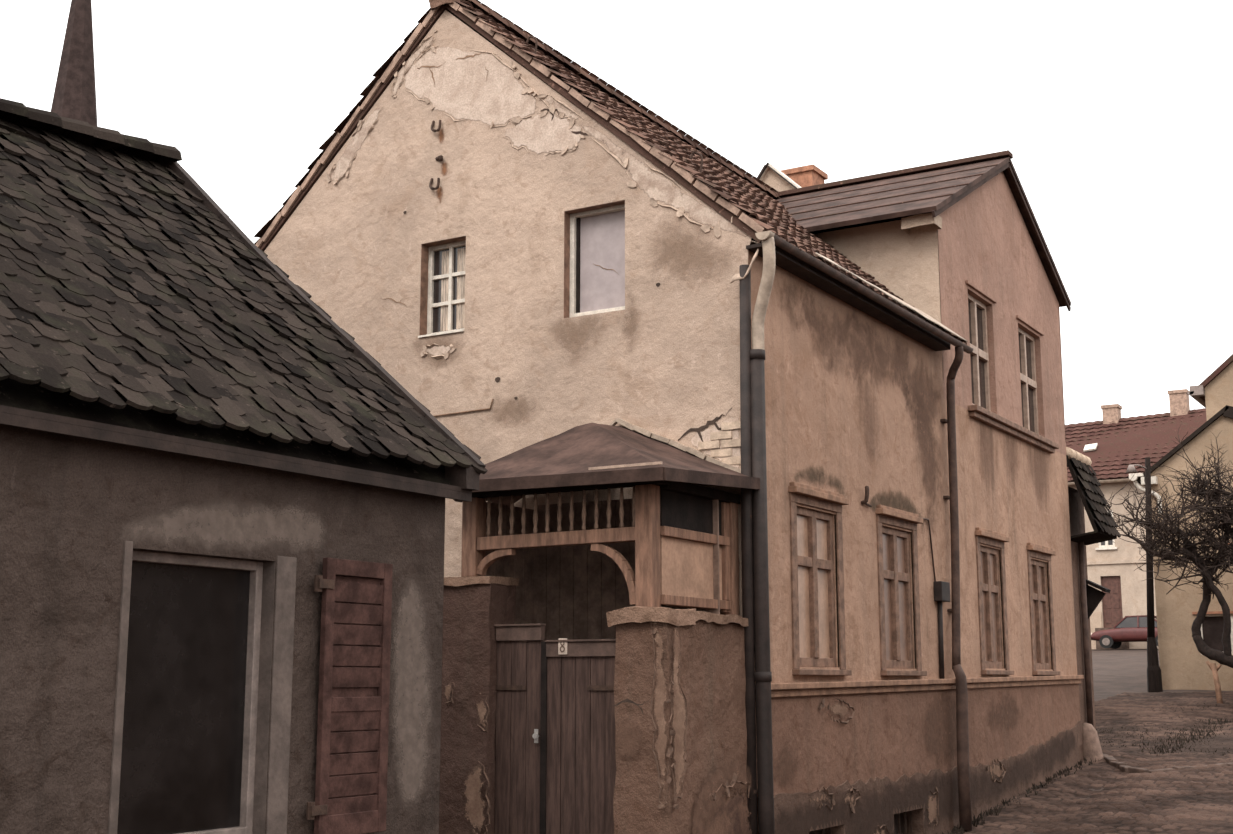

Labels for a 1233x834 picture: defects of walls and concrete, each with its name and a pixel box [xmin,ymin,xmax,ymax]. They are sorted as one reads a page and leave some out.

peeling [325,108,381,185]
flaking render [391,29,759,244]
flaking render [420,343,456,360]
crack [678,408,732,442]
damp [788,298,939,517]
spalling [650,620,688,809]
flaking render [464,761,491,834]
damp [776,733,1075,834]